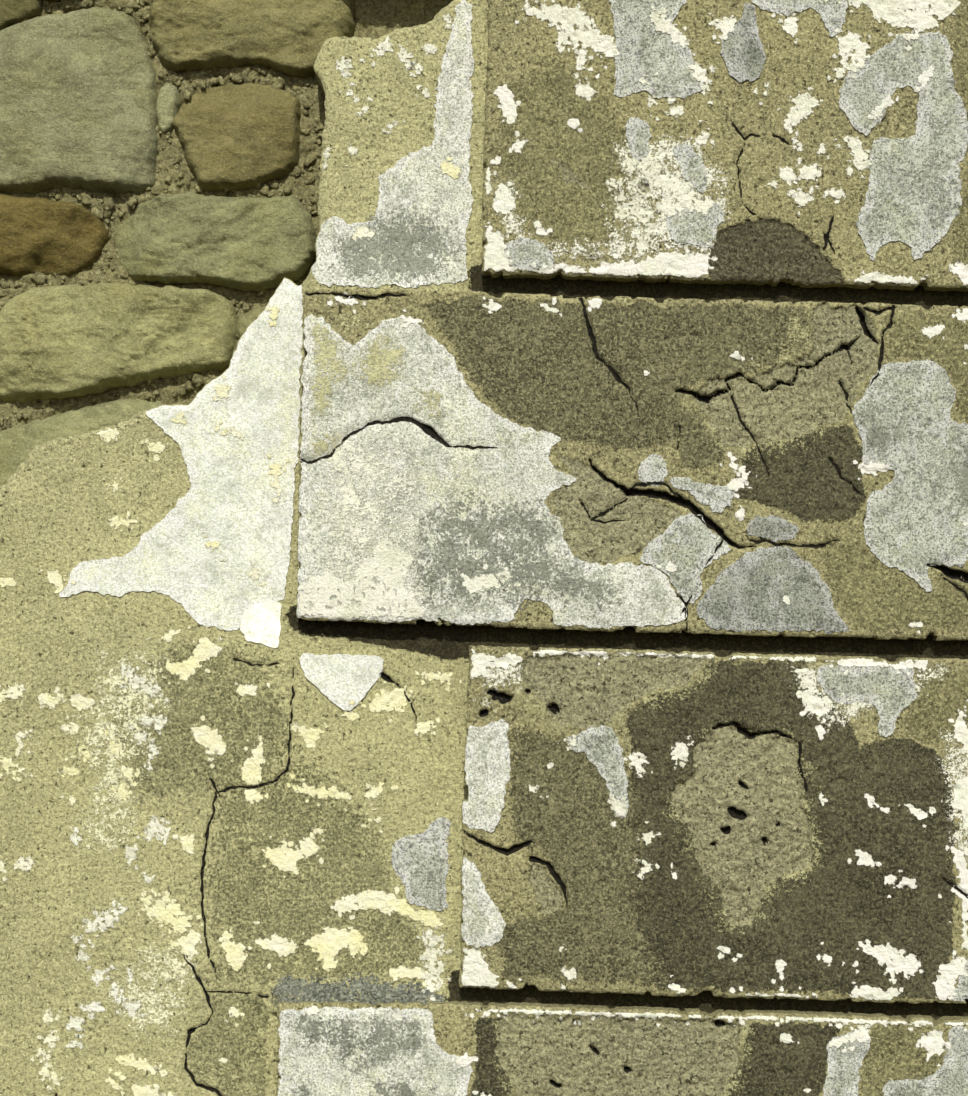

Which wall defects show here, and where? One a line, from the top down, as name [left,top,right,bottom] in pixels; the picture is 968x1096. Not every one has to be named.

peeling [311,0,474,314]
peeling [484,0,968,286]
crack [300,416,499,464]
peeling [38,279,968,811]
crack [579,459,840,564]
crack [675,305,896,475]
crack [926,563,968,600]
crack [183,658,295,1096]
flaking render [219,649,714,1096]
crack [464,831,568,906]
flaking render [669,725,815,927]
peeling [816,939,924,1001]